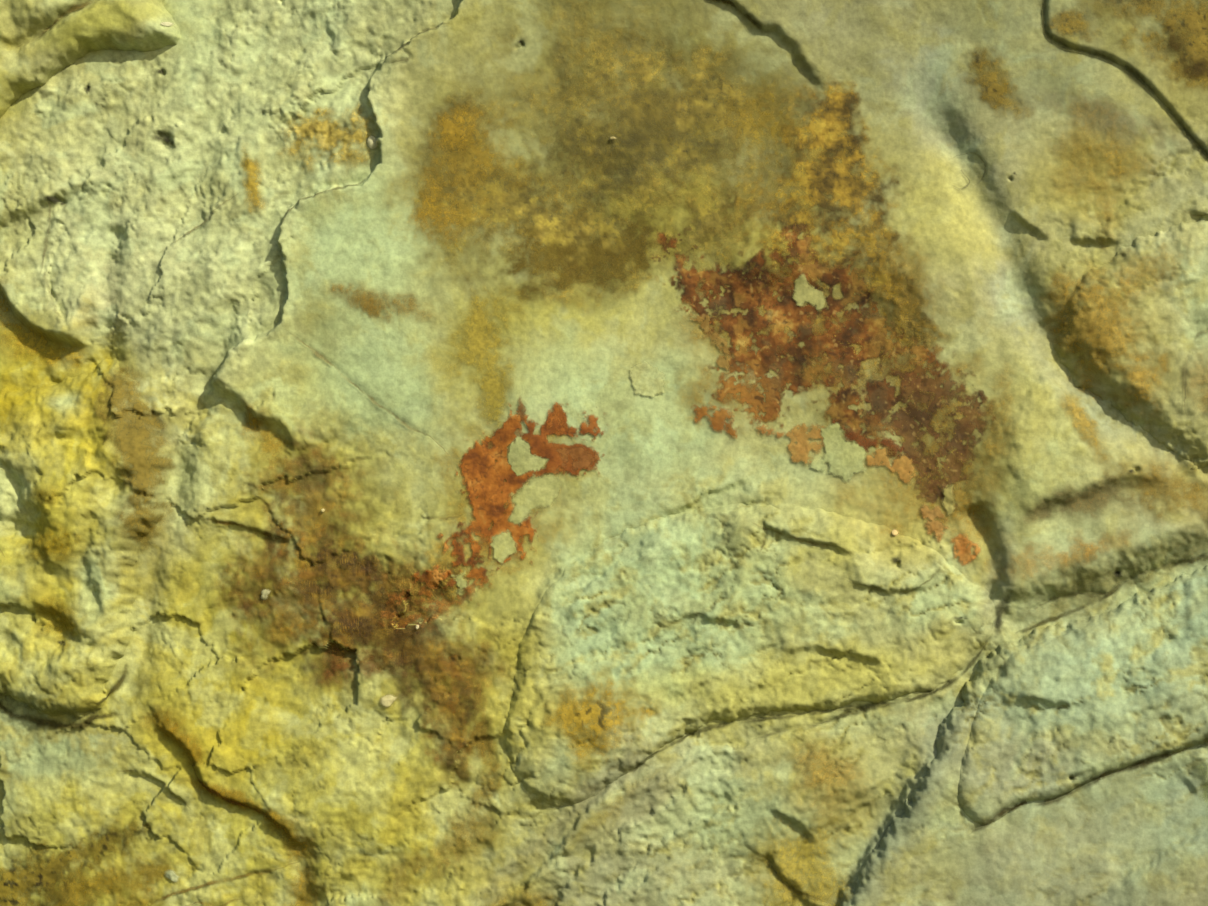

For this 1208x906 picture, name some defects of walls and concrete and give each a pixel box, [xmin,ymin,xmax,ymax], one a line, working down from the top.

crack [714,0,760,28]
crack [1042,0,1151,91]
water stain [1108,0,1208,87]
water stain [414,1,807,303]
crack [1183,128,1208,158]
water stain [454,296,512,420]
rust [657,82,996,565]
rust [388,398,604,625]
crack [1160,555,1208,569]
crack [0,674,126,728]
water stain [222,442,499,869]